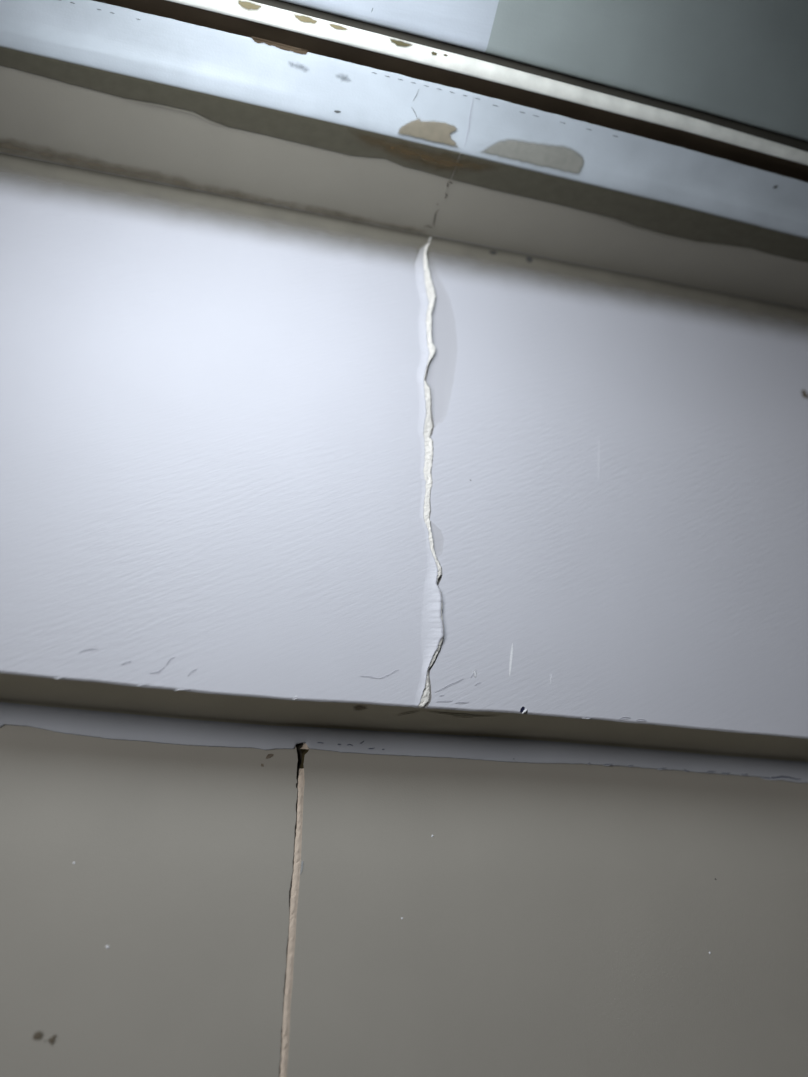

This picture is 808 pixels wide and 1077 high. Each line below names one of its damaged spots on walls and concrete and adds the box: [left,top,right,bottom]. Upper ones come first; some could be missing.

peeling [398,119,457,146]
peeling [483,140,583,173]
crack [360,181,493,718]
crack [279,740,385,1077]